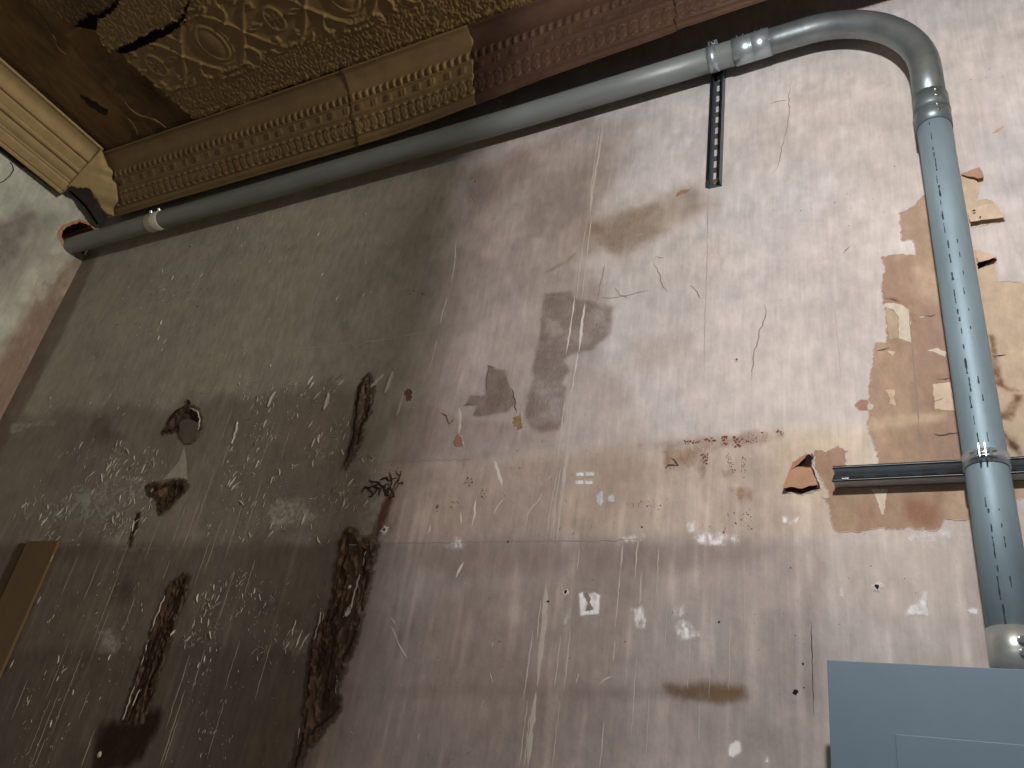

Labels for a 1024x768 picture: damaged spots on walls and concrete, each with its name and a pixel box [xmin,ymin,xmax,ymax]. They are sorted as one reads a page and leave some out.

spalling [15,651,84,768]
spalling [57,219,98,268]
spalling [13,365,219,546]
spalling [96,363,400,768]
leakage [545,217,603,537]
leakage [664,567,746,766]
peeling [812,194,971,534]
peeling [961,167,1024,501]